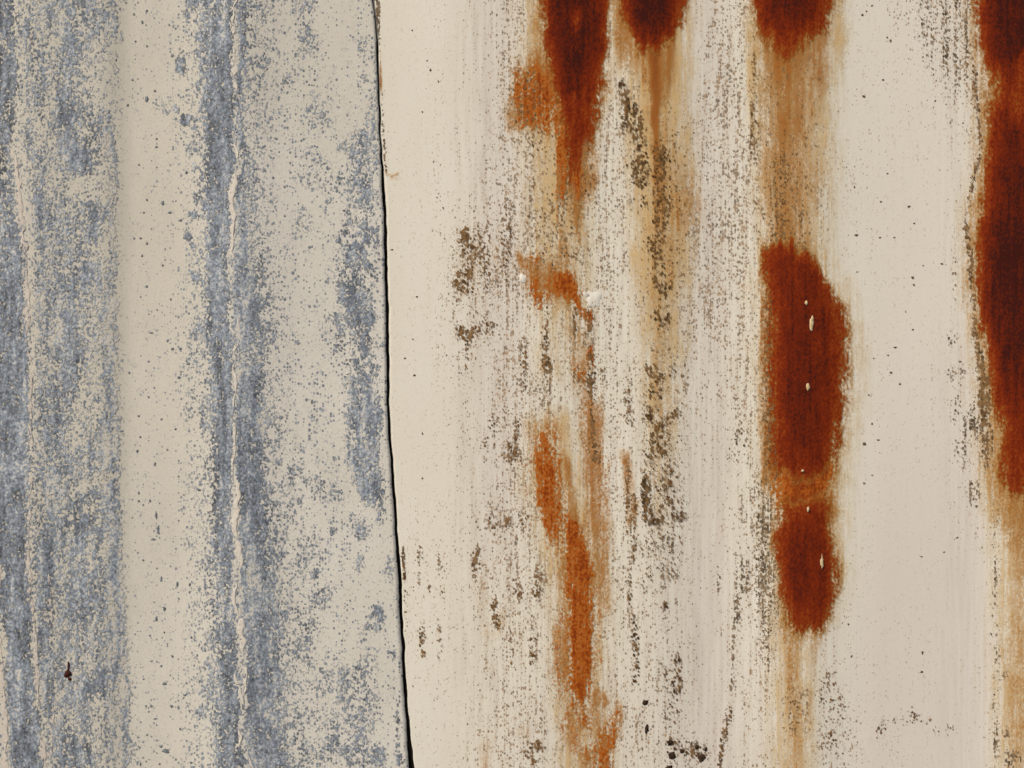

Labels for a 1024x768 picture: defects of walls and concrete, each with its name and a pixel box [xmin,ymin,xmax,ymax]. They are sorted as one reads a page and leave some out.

rust [452,0,696,768]
rust [746,0,852,639]
rust [962,0,1024,544]
rust [655,652,711,768]